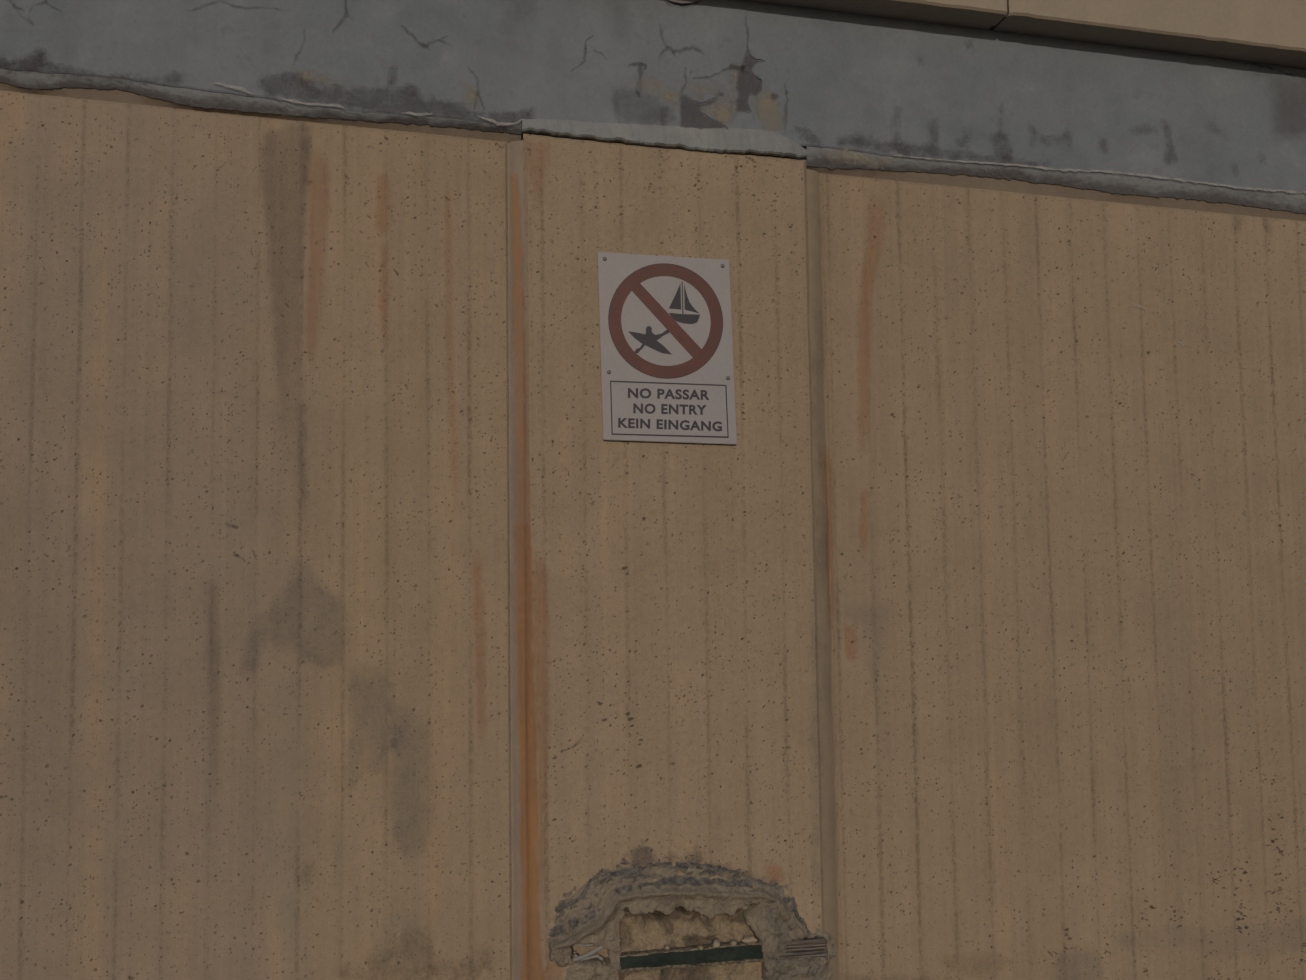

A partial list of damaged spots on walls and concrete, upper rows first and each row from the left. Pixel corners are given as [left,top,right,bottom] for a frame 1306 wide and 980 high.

peeling [678,49,779,130]
spalling [547,856,838,980]